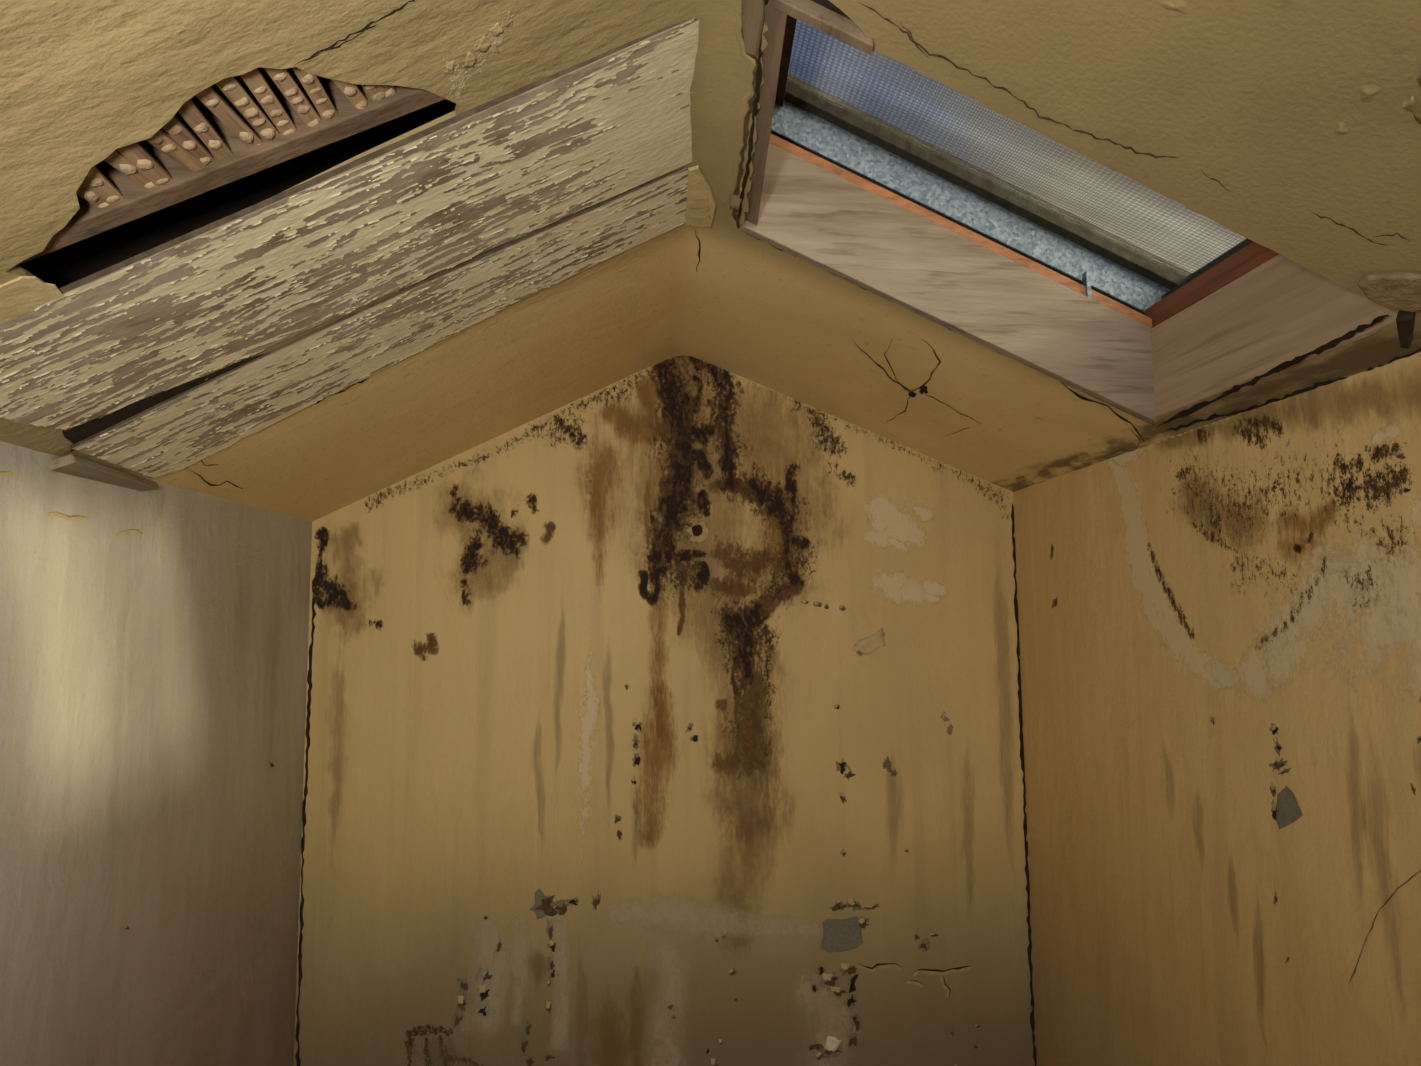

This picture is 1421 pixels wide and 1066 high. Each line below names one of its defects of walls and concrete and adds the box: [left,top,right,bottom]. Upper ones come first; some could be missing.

crack [858,2,1231,192]
peeling [0,11,699,478]
crack [852,329,981,436]
leakage [768,389,1009,520]
peeling [1363,453,1411,493]
leakage [312,526,357,611]
leakage [365,355,823,845]
leakage [1172,415,1421,701]
peeling [1269,723,1303,829]
peeling [808,897,879,1062]
crack [855,963,971,997]
crack [1349,870,1421,984]